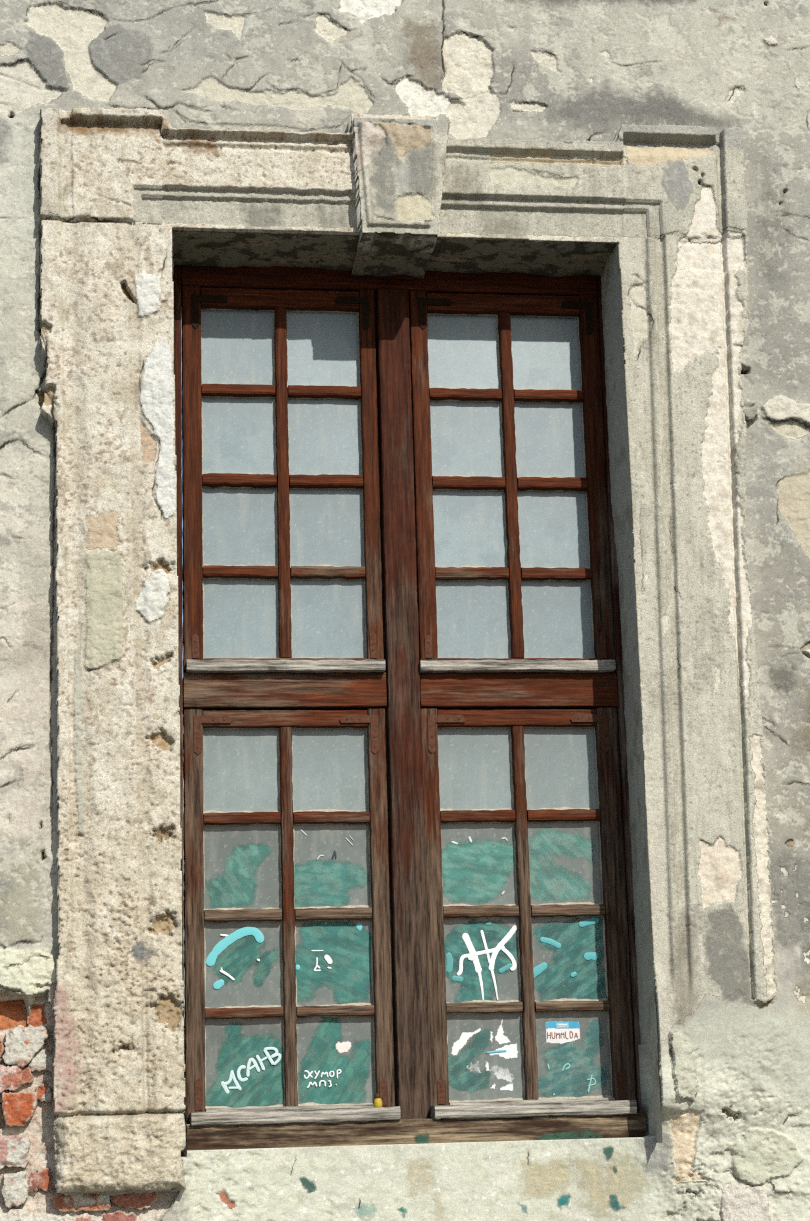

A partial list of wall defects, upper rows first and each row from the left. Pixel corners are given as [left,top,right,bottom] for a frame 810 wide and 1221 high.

spalling [0,1,117,117]
crack [104,0,218,40]
crack [105,33,399,131]
spalling [303,0,402,43]
spalling [181,30,545,177]
peeling [135,271,162,317]
crack [0,132,131,850]
peeling [139,338,176,518]
spalling [669,181,753,717]
peeling [757,395,810,439]
spalling [698,735,808,997]
flaking render [0,946,179,1221]